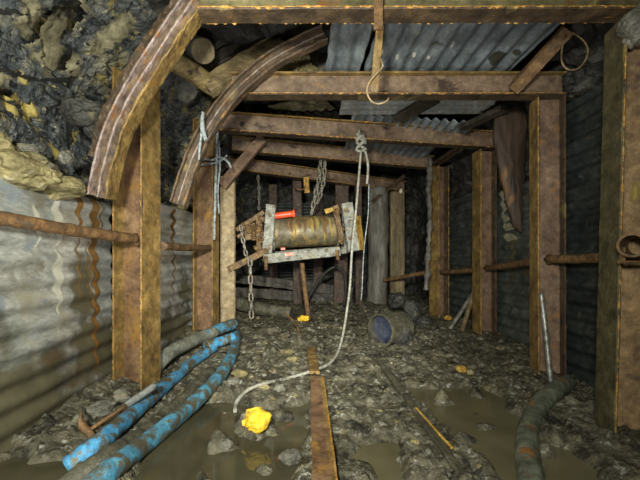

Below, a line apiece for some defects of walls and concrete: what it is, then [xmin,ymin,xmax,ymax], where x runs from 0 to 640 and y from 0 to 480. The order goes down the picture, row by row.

corrosion [75,197,104,229]
corrosion [74,239,102,369]